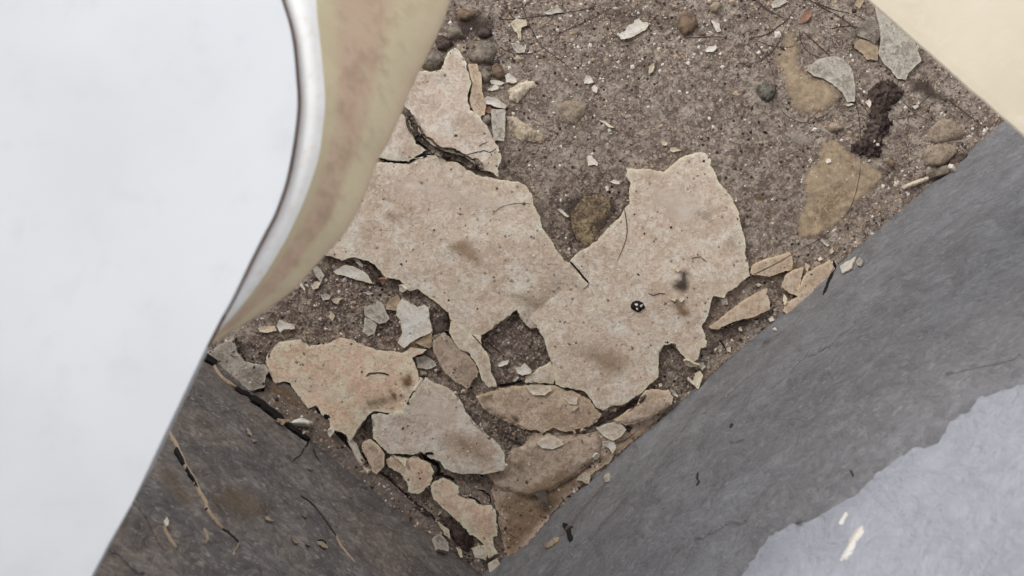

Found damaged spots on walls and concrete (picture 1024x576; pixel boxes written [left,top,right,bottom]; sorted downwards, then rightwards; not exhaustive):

peeling [467,64,506,142]
peeling [807,56,871,108]
crack [379,154,435,164]
spalling [548,155,629,258]
spalling [235,262,449,394]
spalling [483,312,552,395]
spalling [658,343,706,397]
crack [204,353,436,519]
spalling [347,414,374,475]
spalling [452,388,563,449]
peeling [570,421,626,460]
crack [169,430,240,556]